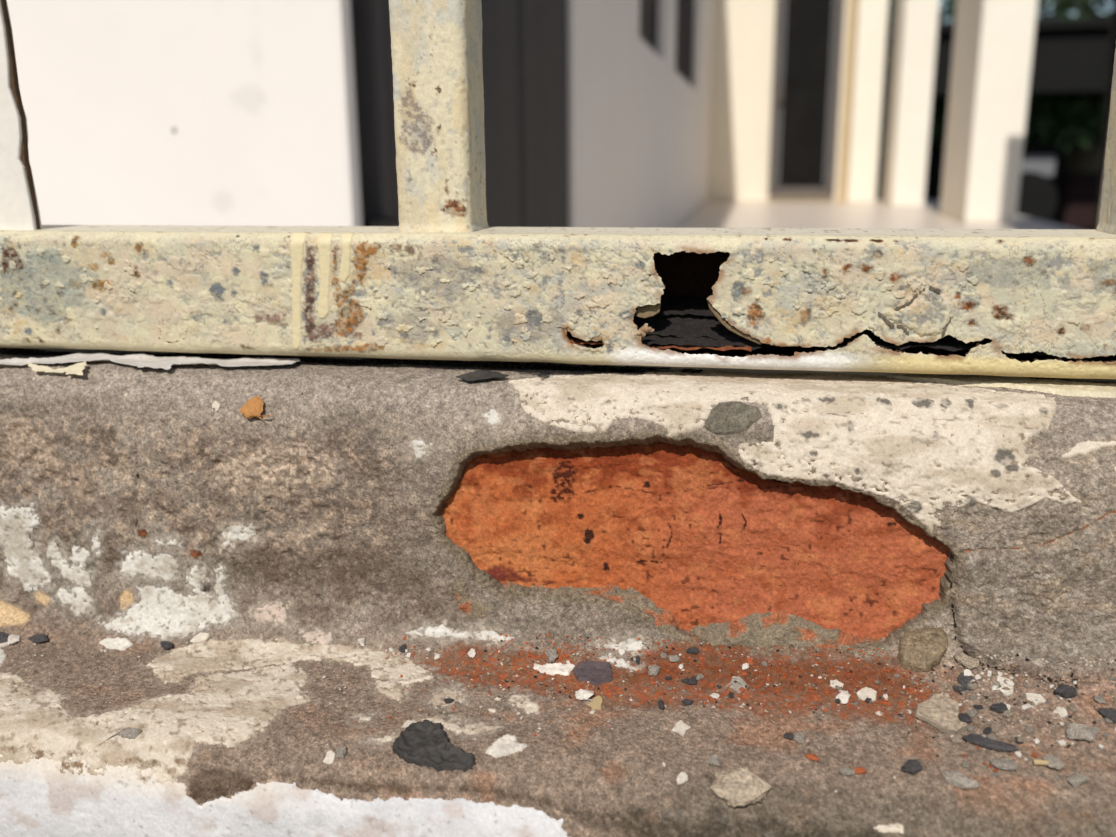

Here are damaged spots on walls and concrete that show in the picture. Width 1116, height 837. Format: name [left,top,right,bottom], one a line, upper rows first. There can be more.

rust [304,242,383,352]
rust [748,304,764,324]
peeling [0,353,300,376]
spalling [406,369,1116,672]
crack [944,510,1116,683]
flaking render [0,498,567,837]
peeling [533,630,648,686]
peeling [856,687,877,702]
peeling [996,675,1068,718]
peeling [671,720,691,737]
spalling [710,767,772,808]
peeling [873,823,904,834]